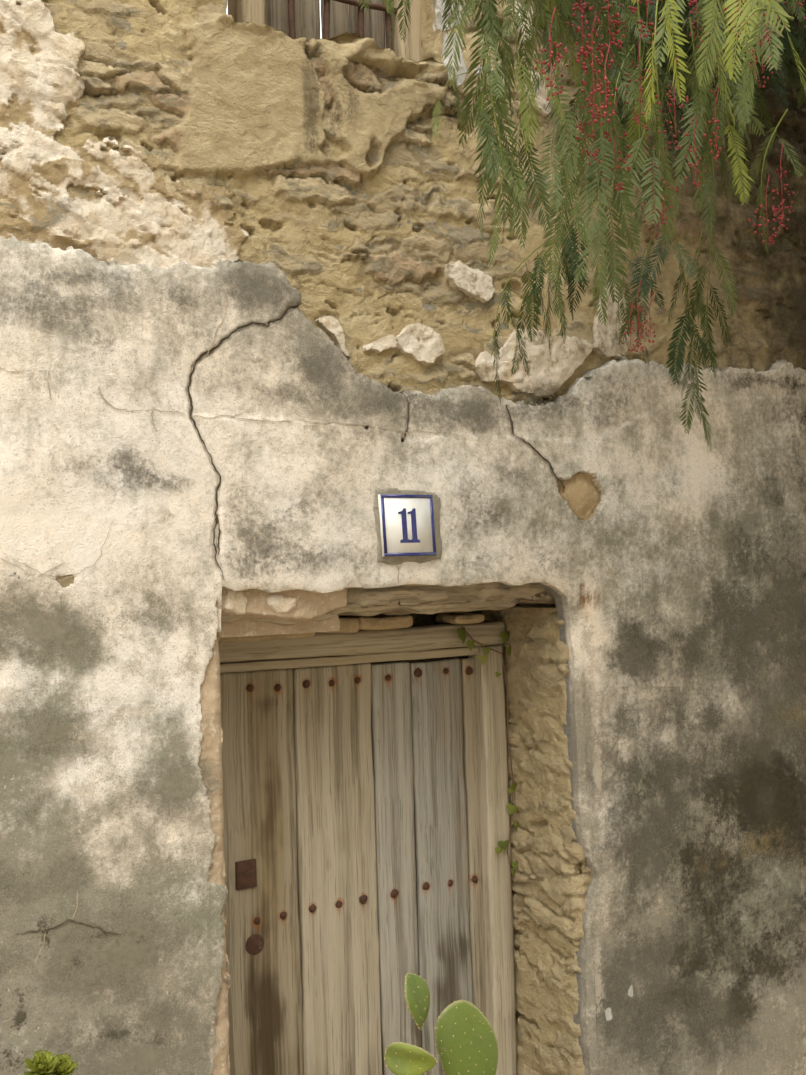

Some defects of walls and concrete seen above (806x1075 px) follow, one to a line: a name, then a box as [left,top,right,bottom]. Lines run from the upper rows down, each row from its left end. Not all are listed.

flaking render [0,0,806,406]
crack [98,280,461,579]
water stain [350,384,566,433]
crack [504,405,565,533]
spalling [557,472,603,521]
crack [0,521,113,585]
water stain [0,597,93,658]
water stain [133,592,182,631]
water stain [137,759,218,819]
water stain [583,531,806,1073]
crack [16,890,134,964]
water stain [11,993,26,1029]